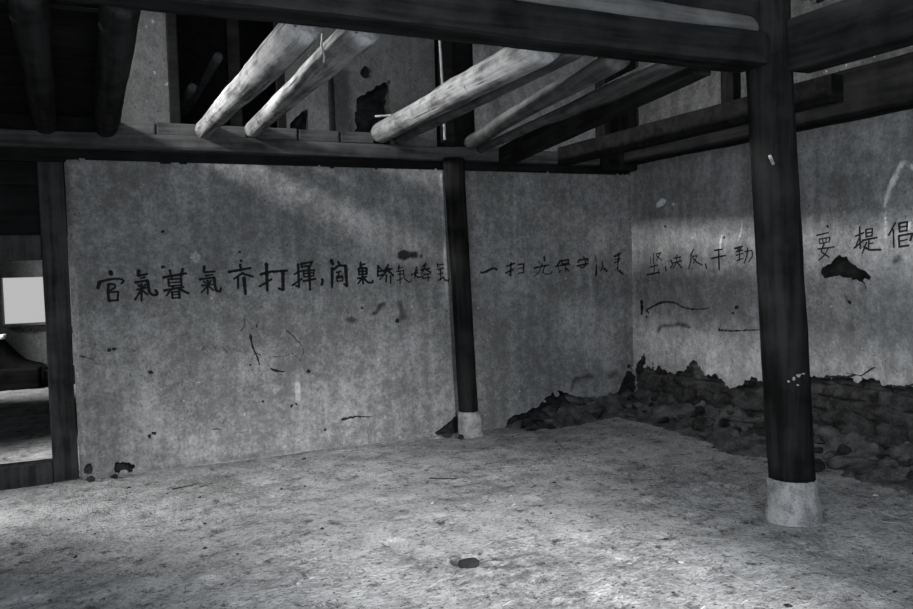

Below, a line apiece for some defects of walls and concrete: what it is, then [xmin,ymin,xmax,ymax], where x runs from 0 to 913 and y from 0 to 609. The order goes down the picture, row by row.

flaking render [355,66,391,144]
flaking render [818,255,871,284]
flaking render [507,390,568,425]
flaking render [616,353,764,418]
flaking render [810,375,913,450]